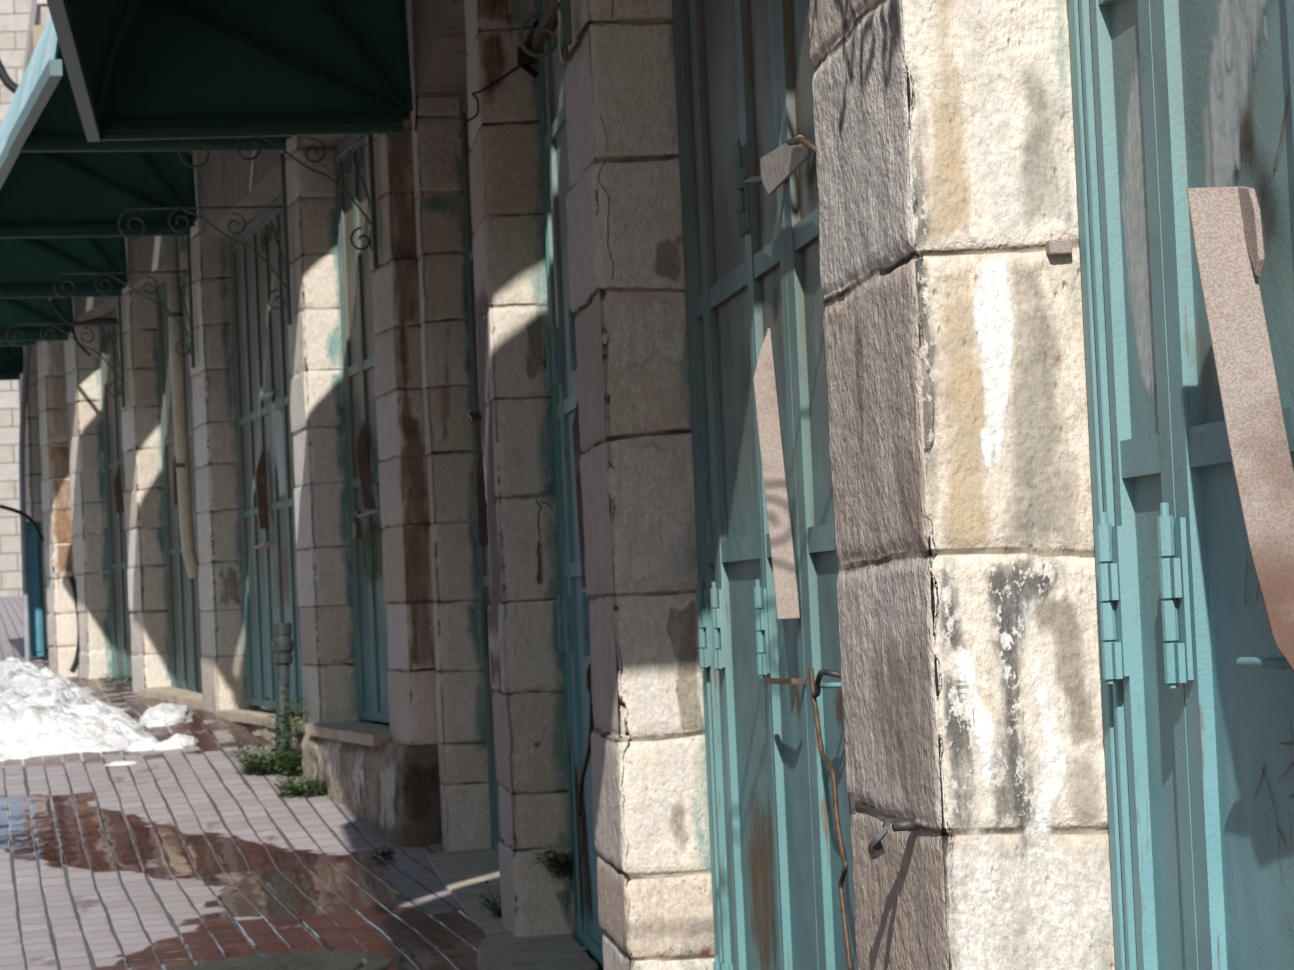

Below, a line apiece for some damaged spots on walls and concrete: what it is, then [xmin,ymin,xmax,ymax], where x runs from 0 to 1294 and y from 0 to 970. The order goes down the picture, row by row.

crack [598,124,614,279]
water stain [950,597,1111,970]
corrosion [748,804,776,970]